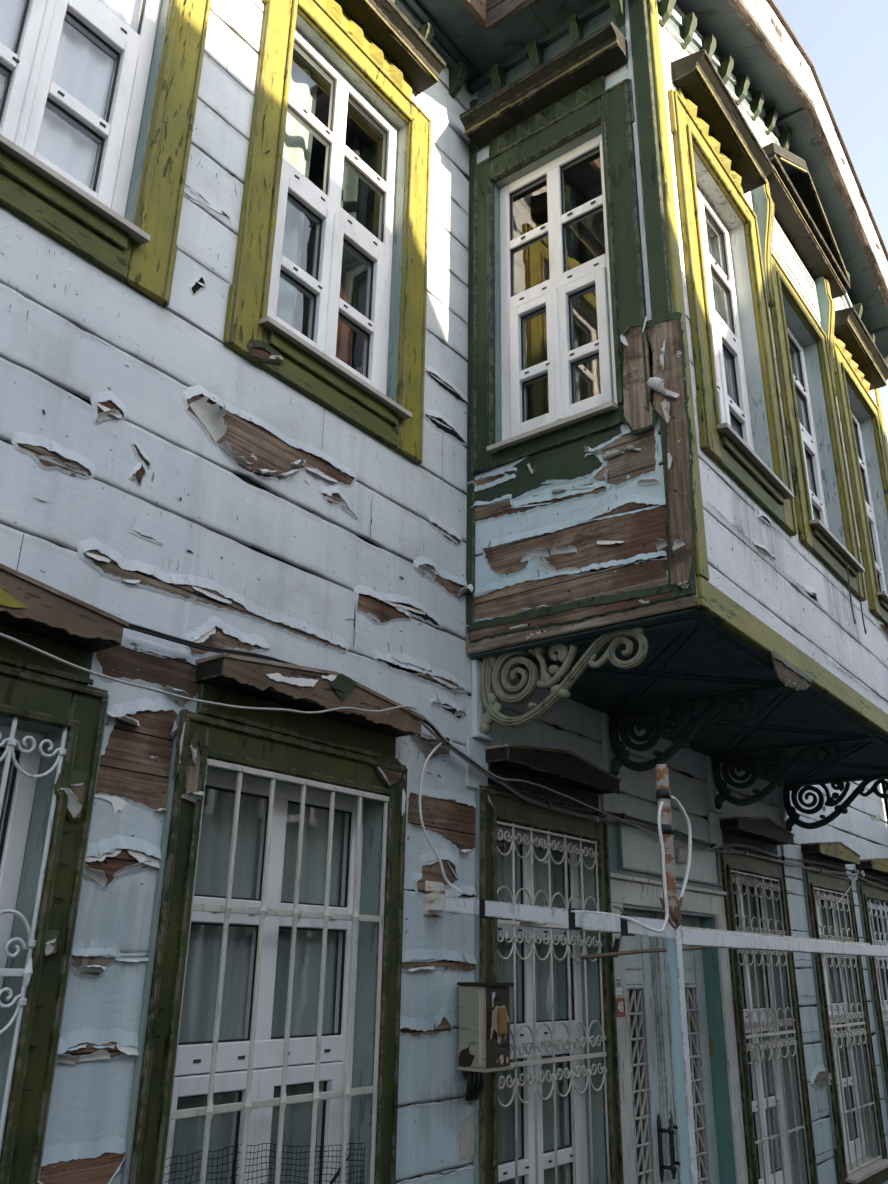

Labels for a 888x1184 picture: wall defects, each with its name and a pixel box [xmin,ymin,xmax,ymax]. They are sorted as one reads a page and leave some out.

peeling [90,391,128,425]
peeling [11,431,96,480]
peeling [181,384,358,520]
peeling [413,312,696,643]
peeling [353,584,442,629]
peeling [54,539,357,822]
peeling [374,646,468,721]
peeling [408,724,453,764]
peeling [374,757,497,899]
peeling [56,1027,139,1067]
peeling [38,1136,126,1184]